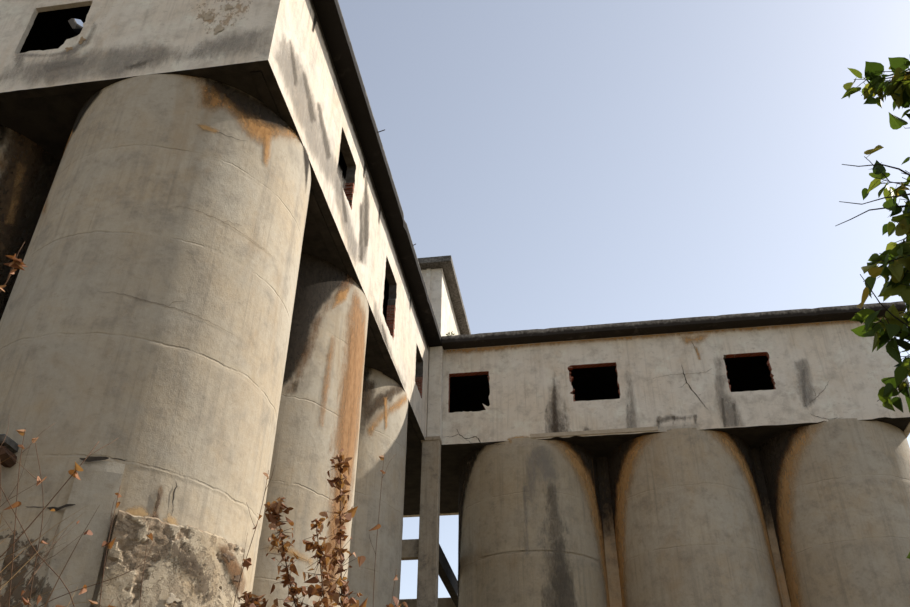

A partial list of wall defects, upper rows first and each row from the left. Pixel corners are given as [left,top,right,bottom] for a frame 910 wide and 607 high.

water stain [28,50,167,80]
rust [204,88,292,141]
water stain [0,130,41,270]
water stain [278,0,428,348]
crack [647,337,709,406]
rust [325,296,407,607]
spalling [221,546,245,596]